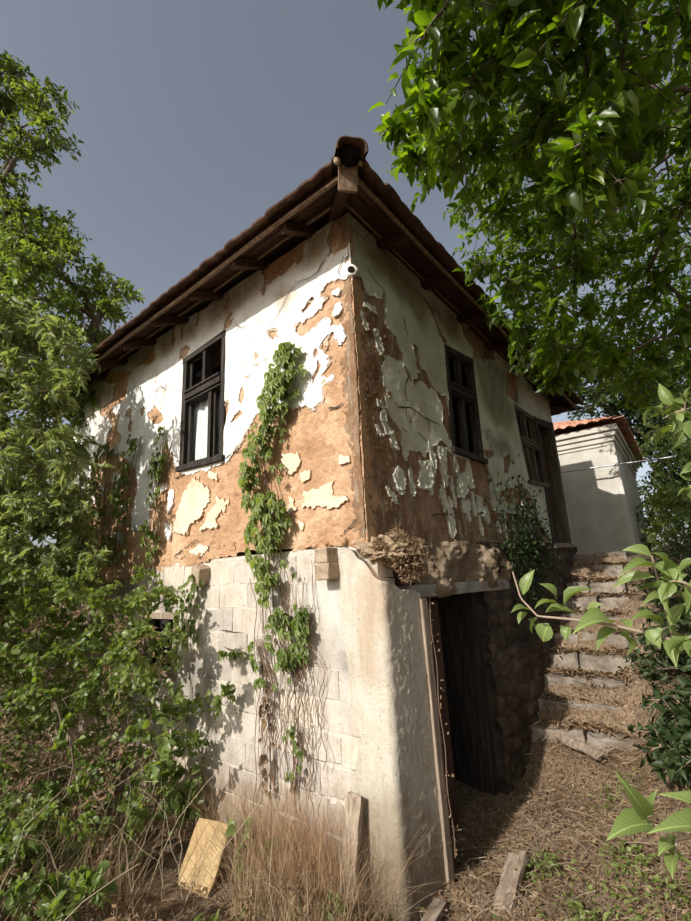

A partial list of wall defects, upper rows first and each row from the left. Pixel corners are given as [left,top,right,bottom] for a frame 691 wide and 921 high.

flaking render [88,276,551,585]
crack [395,376,438,442]